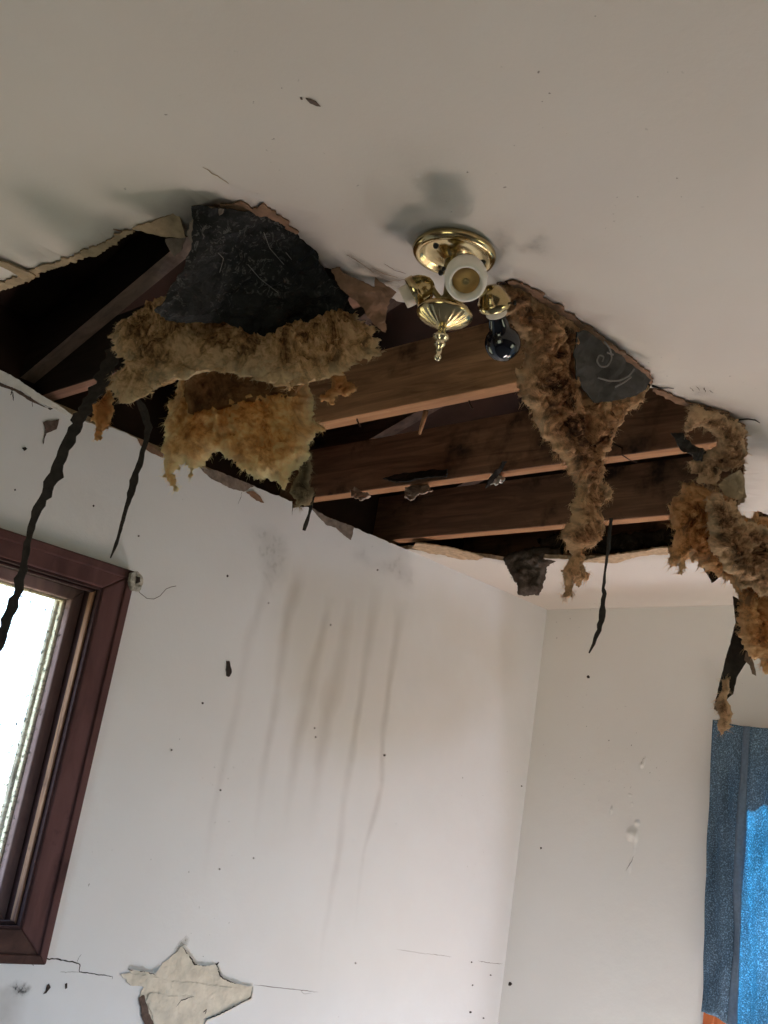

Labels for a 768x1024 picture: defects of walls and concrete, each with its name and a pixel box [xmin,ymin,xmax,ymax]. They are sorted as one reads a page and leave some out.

spalling [209,201,299,234]
spalling [0,229,135,291]
spalling [508,280,746,427]
peeling [43,419,59,444]
spalling [201,468,264,503]
spalling [312,508,354,540]
flaking render [121,943,254,1024]